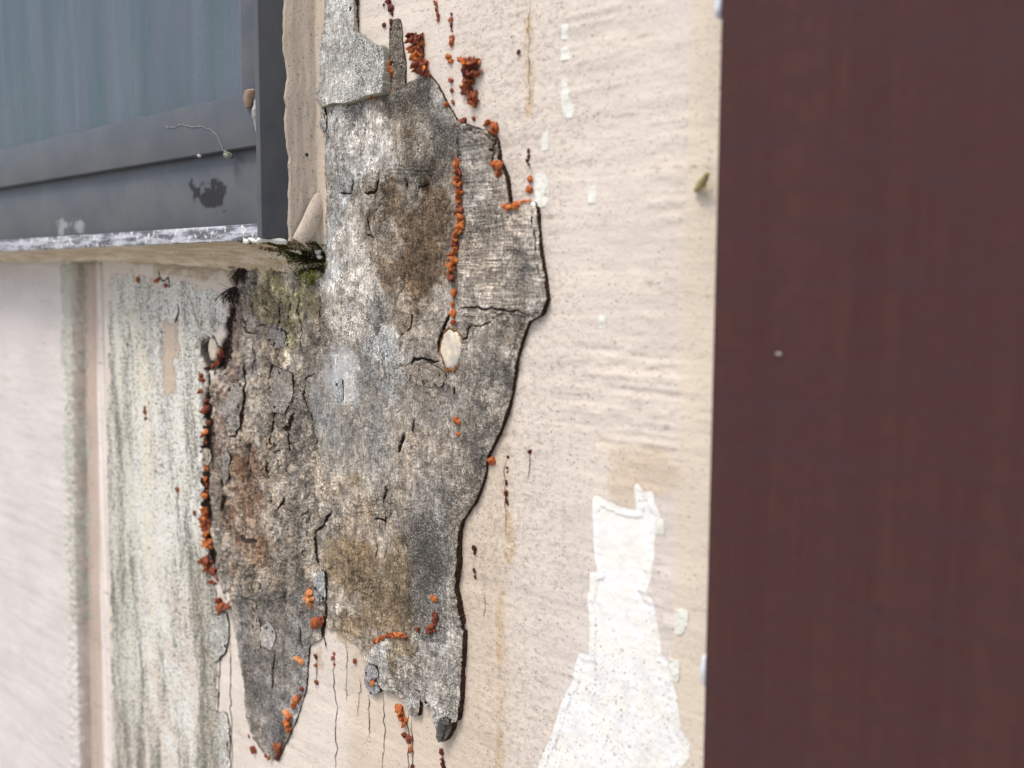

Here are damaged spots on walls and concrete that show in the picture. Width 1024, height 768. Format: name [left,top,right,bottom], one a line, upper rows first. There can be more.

water stain [215,267,250,309]
crack [412,306,527,363]
crack [174,291,322,567]
crack [399,420,415,452]
crack [313,511,332,563]
crack [375,487,387,558]
peeling [538,484,691,768]
crack [217,635,233,764]
crack [299,601,414,768]